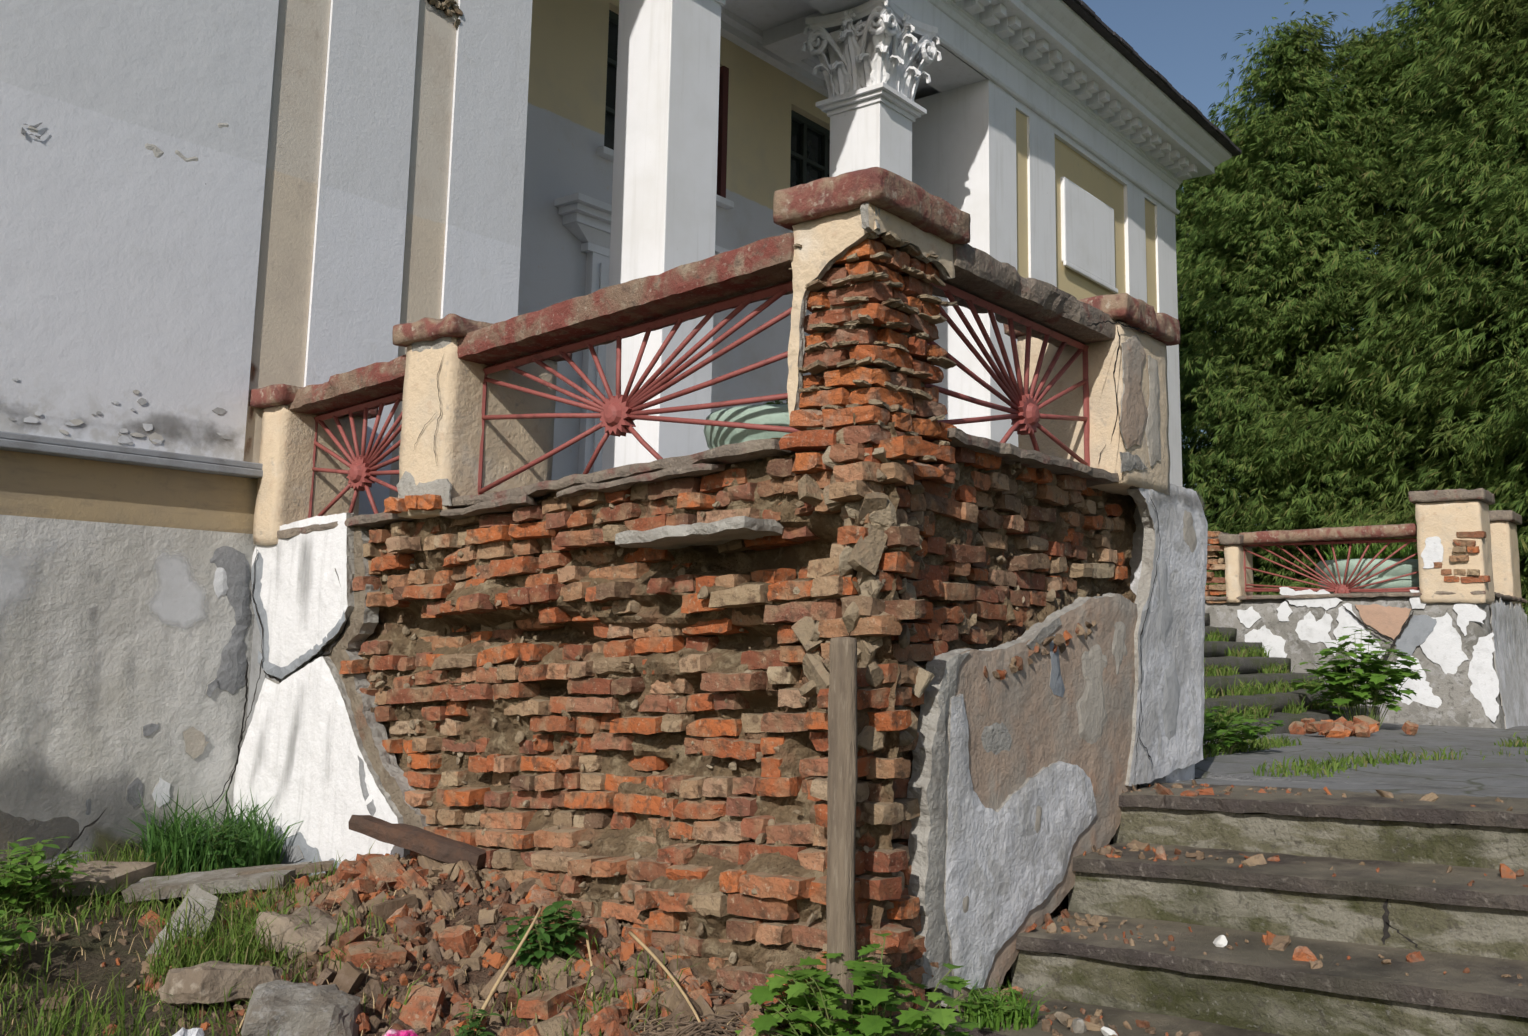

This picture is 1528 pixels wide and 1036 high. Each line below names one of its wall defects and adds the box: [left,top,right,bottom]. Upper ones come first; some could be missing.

peeling [21,123,46,139]
peeling [60,390,178,445]
crack [414,355,444,464]
peeling [1119,335,1161,473]
peeling [1183,510,1197,552]
spalling [1421,531,1491,583]
crack [204,547,350,816]
flaking render [339,234,1128,1032]
flaking render [1076,498,1173,744]
peeling [1162,660,1180,740]
peeling [1237,587,1528,729]
crack [1381,899,1421,950]